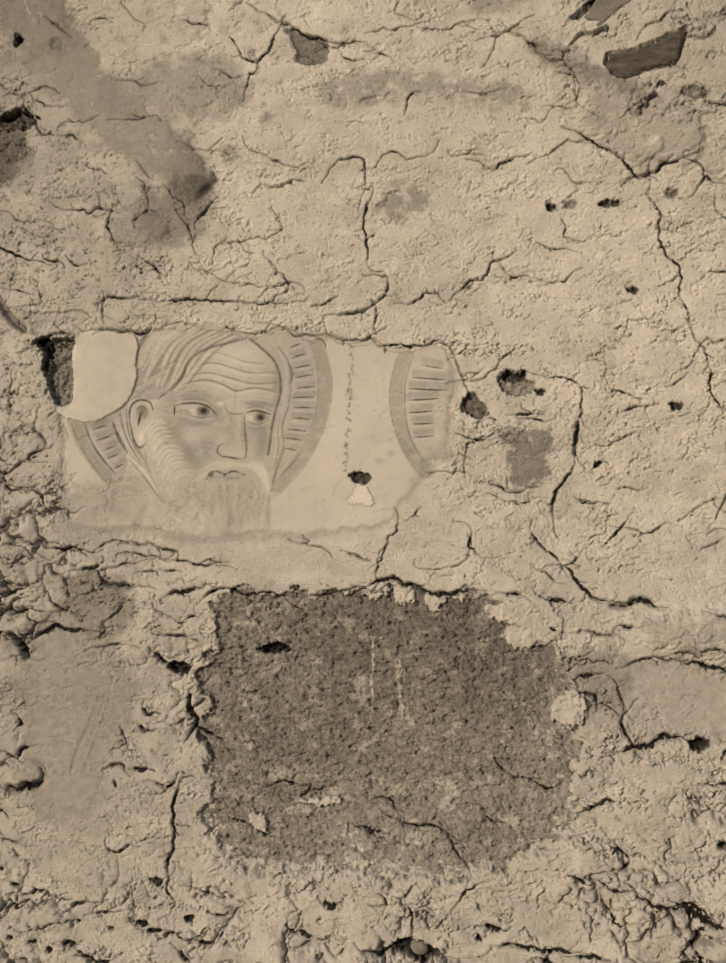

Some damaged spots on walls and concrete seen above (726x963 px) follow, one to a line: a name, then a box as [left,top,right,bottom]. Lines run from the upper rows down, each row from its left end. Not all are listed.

water stain [103,54,244,115]
flaking render [584,0,631,23]
flaking render [607,30,688,79]
water stain [140,186,204,244]
crack [170,151,507,396]
crack [464,51,720,407]
crack [0,451,485,667]
crack [489,371,665,639]
spalling [196,578,588,883]
crack [0,867,225,963]
crack [476,924,618,963]
crack [577,841,723,963]